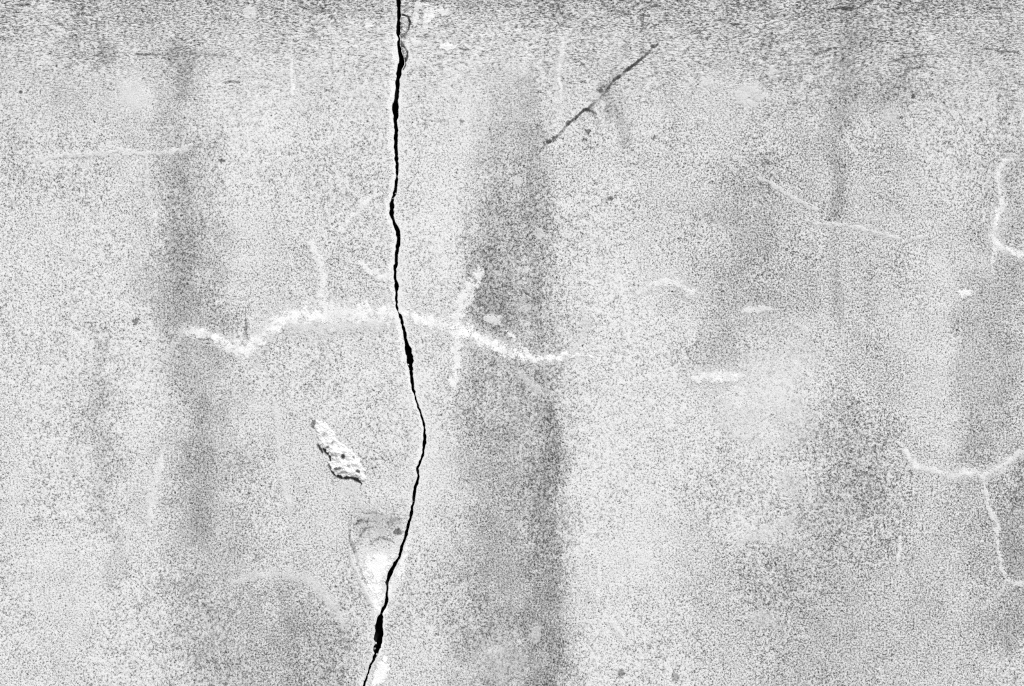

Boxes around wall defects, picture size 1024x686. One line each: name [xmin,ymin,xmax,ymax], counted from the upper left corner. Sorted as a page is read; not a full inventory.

crack [363,0,431,686]
crack [546,43,659,143]